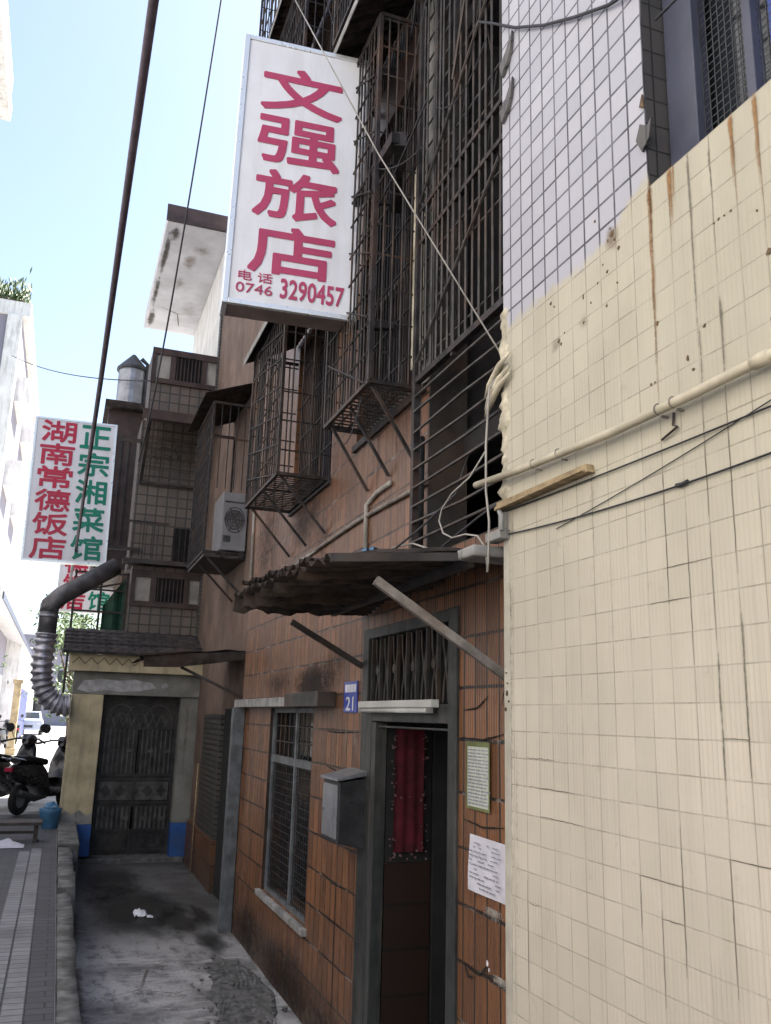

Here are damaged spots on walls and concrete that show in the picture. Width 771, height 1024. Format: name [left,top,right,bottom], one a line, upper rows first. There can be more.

corrosion [647,189,656,346]
crack [722,674,752,778]
crack [640,838,687,995]
crack [730,859,771,1000]